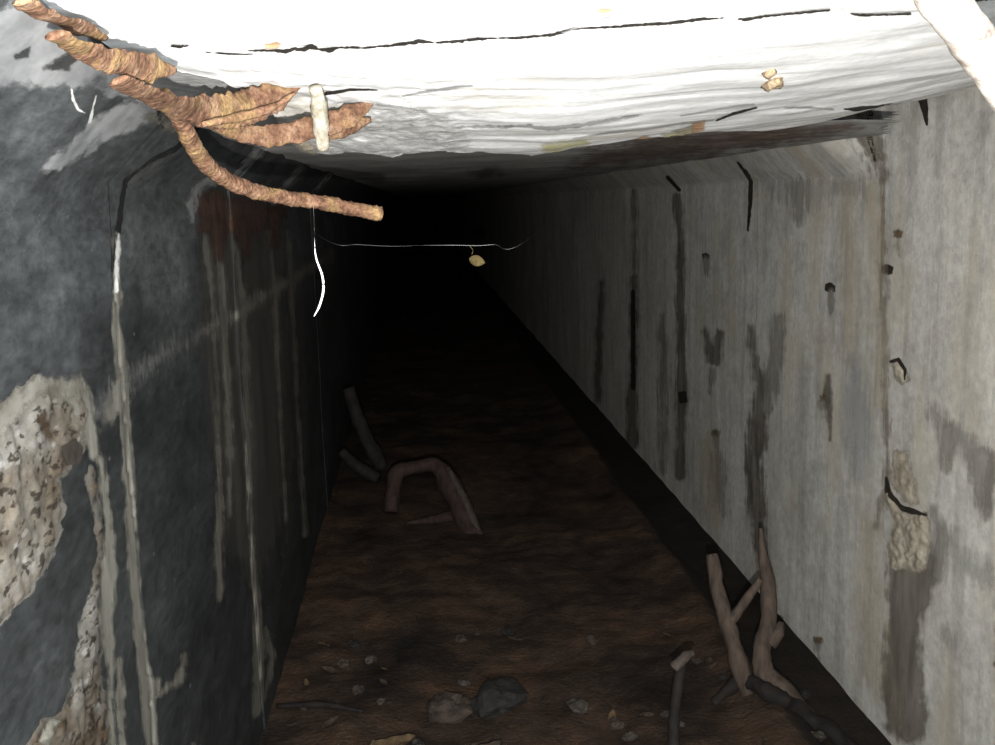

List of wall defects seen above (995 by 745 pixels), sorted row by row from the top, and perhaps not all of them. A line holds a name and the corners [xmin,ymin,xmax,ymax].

water stain [71,85,96,123]
crack [112,110,201,273]
crack [170,0,912,55]
spalling [0,374,127,745]
water stain [103,232,186,745]
water stain [200,228,334,718]
water stain [626,190,639,448]
water stain [658,176,688,480]
water stain [745,315,786,559]
water stain [823,375,832,441]
water stain [881,508,958,743]
water stain [933,411,995,520]